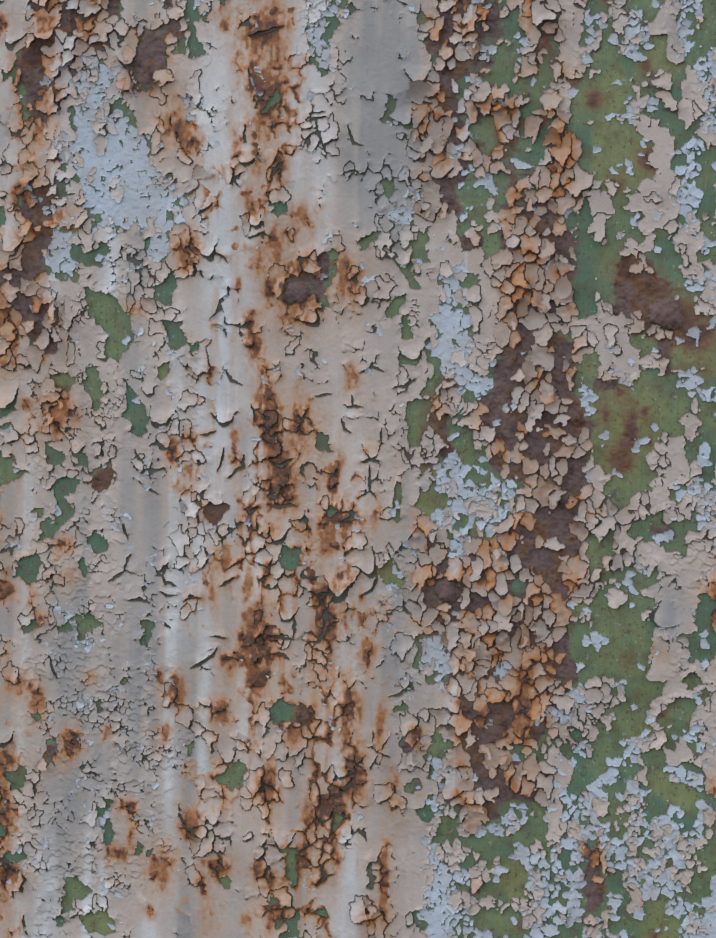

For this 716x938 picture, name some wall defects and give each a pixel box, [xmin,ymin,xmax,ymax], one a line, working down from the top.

rust [7,36,55,74]
peeling [1,0,162,132]
rust [206,0,294,221]
peeling [0,109,211,584]
rust [228,201,368,546]
peeling [347,0,716,848]
rust [610,253,699,339]
crack [49,656,58,679]
rust [218,565,279,724]
rust [300,449,388,814]
peeling [467,862,529,900]
peeling [583,816,632,914]